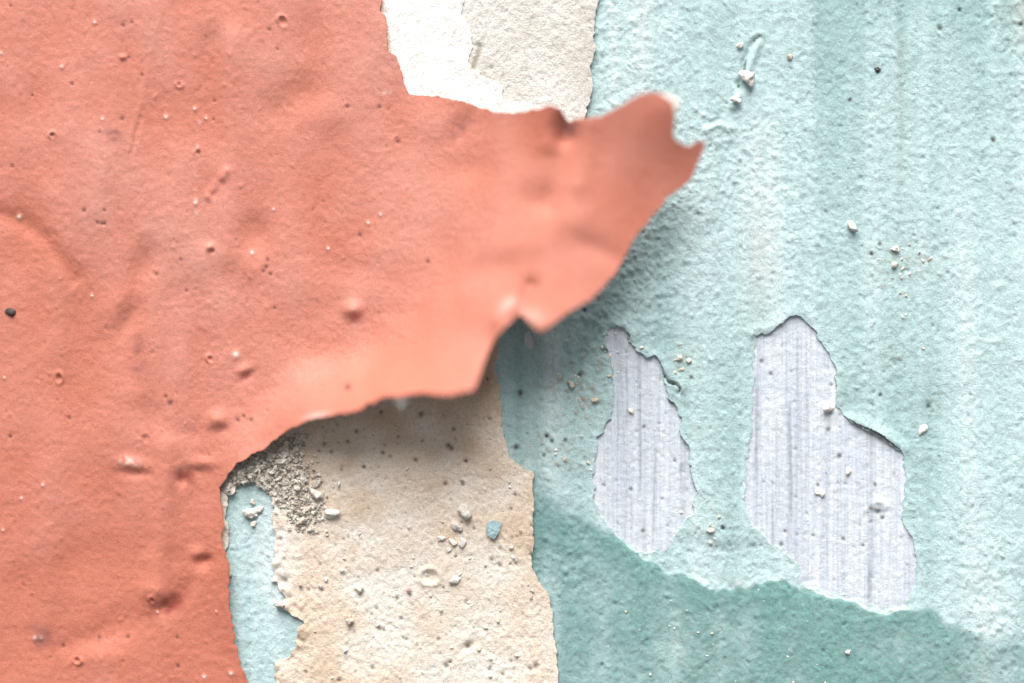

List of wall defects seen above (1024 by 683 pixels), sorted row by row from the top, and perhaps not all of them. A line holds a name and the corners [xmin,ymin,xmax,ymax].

peeling [216,0,705,683]
peeling [742,315,917,610]